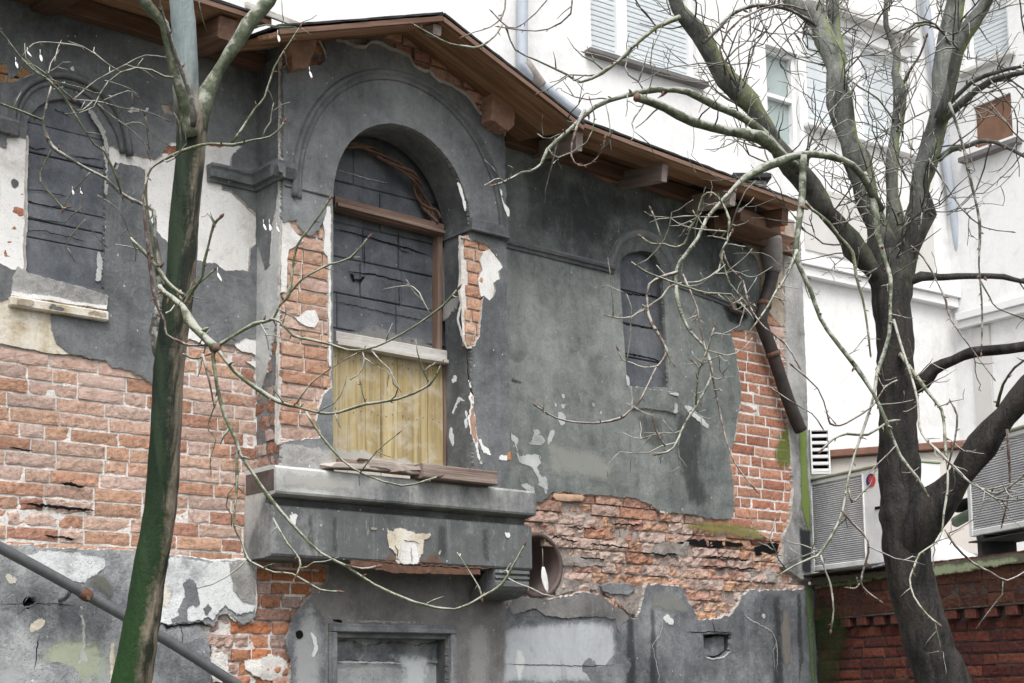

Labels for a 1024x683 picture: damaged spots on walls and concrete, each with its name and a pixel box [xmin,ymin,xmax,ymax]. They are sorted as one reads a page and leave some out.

spalling [0,136,29,271]
spalling [88,110,176,242]
spalling [442,235,502,349]
spalling [781,224,795,237]
crack [22,482,95,511]
spalling [0,299,152,583]
spalling [161,142,342,683]
spalling [371,527,431,565]
peeling [449,397,468,446]
spalling [478,243,805,620]